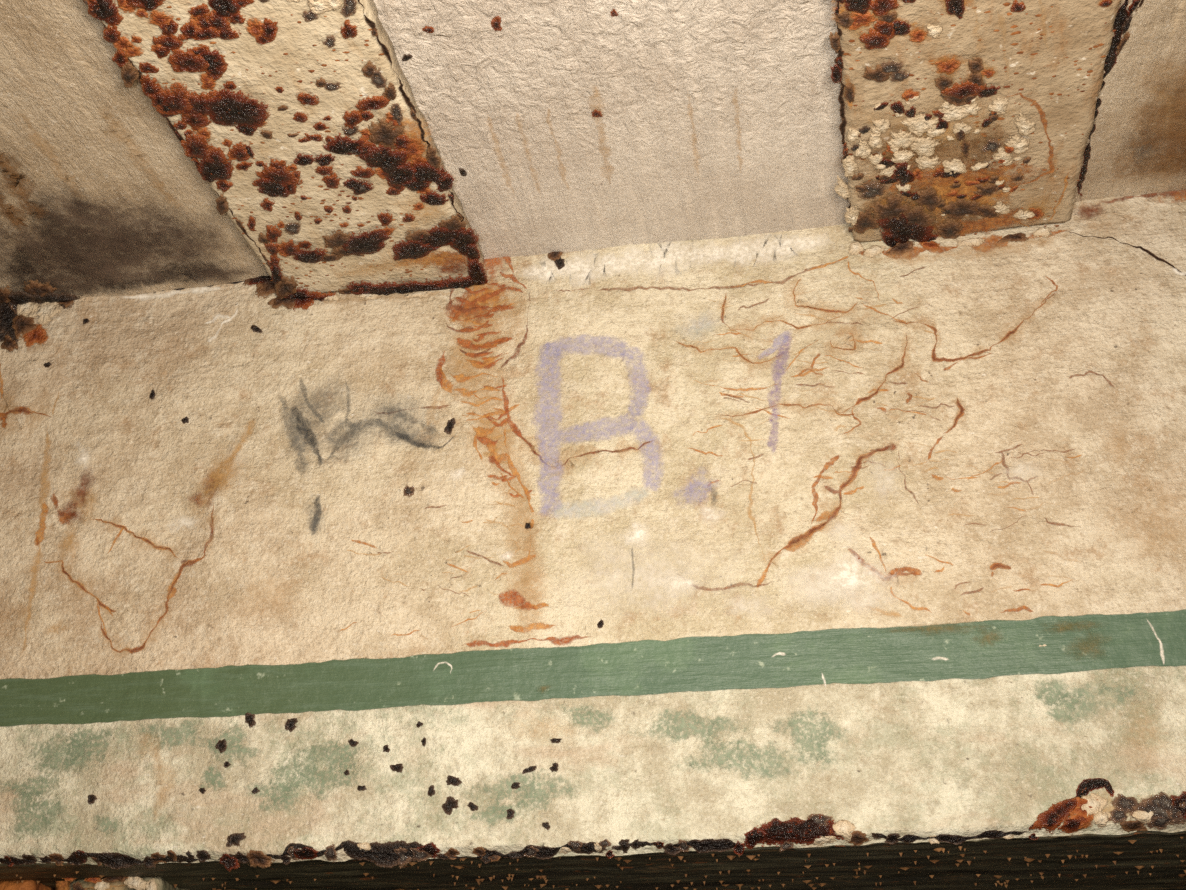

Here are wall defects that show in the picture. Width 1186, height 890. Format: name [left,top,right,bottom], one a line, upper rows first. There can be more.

rust [829,0,1064,259]
rust [1049,43,1106,99]
crack [985,0,1186,276]
leakage [0,156,243,300]
crack [522,3,1081,591]
crack [45,506,214,654]
rust [467,590,587,647]
crack [848,538,982,616]